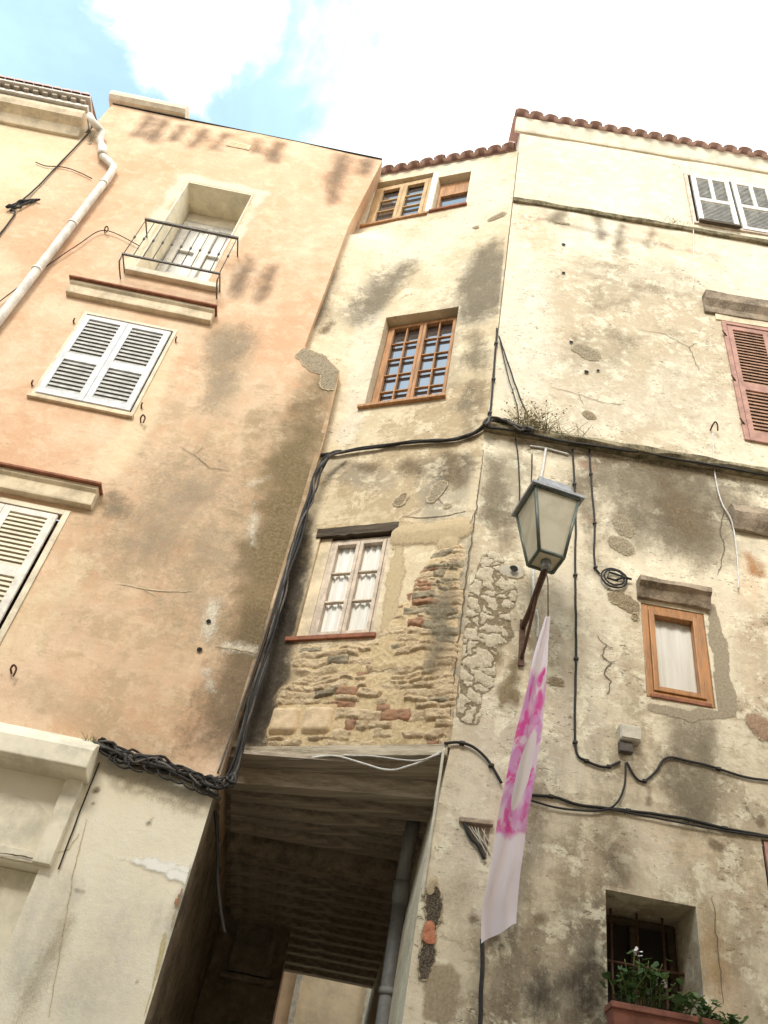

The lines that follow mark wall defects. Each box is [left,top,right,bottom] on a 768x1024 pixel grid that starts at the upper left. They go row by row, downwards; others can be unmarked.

damp [459,241,504,322]
flaking render [295,348,339,390]
damp [202,421,325,746]
flaking render [264,543,525,746]
crack [597,635,616,694]
crack [49,819,87,1016]
peeling [122,857,190,927]
flaking render [417,876,443,981]